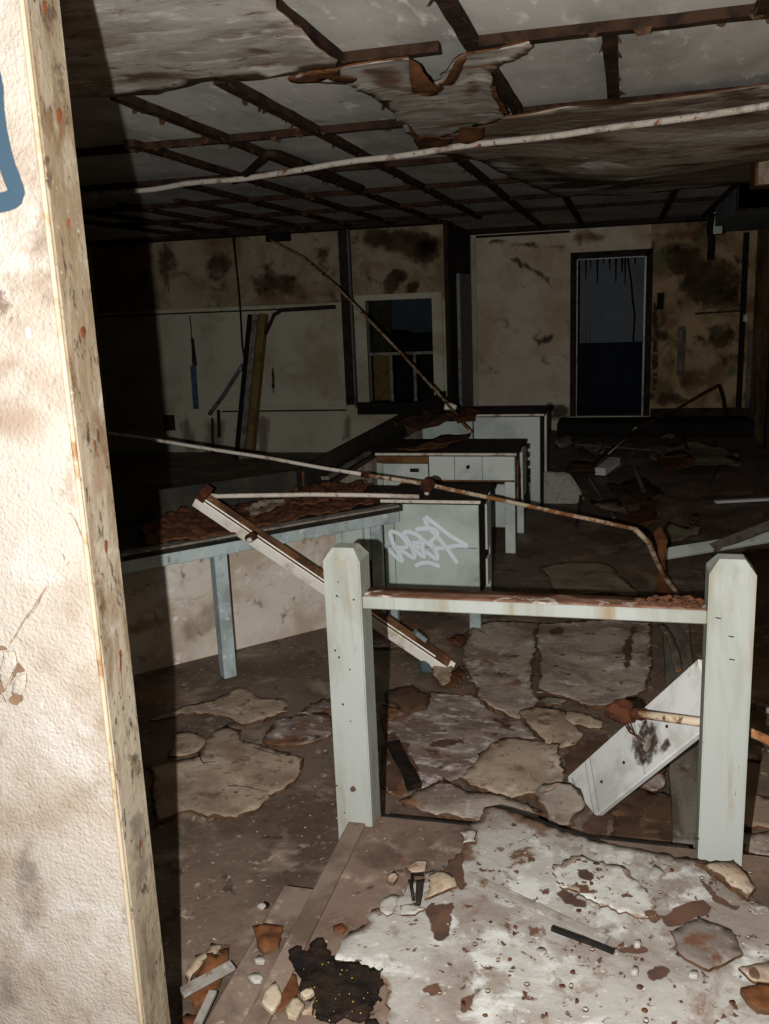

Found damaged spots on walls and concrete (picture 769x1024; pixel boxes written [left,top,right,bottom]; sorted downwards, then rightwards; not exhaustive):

damp [383,269,419,294]
damp [364,229,439,263]
damp [668,234,741,309]
peeling [0,646,27,705]
peeling [641,734,653,753]
peeling [559,942,595,1012]
peeling [631,939,651,1024]